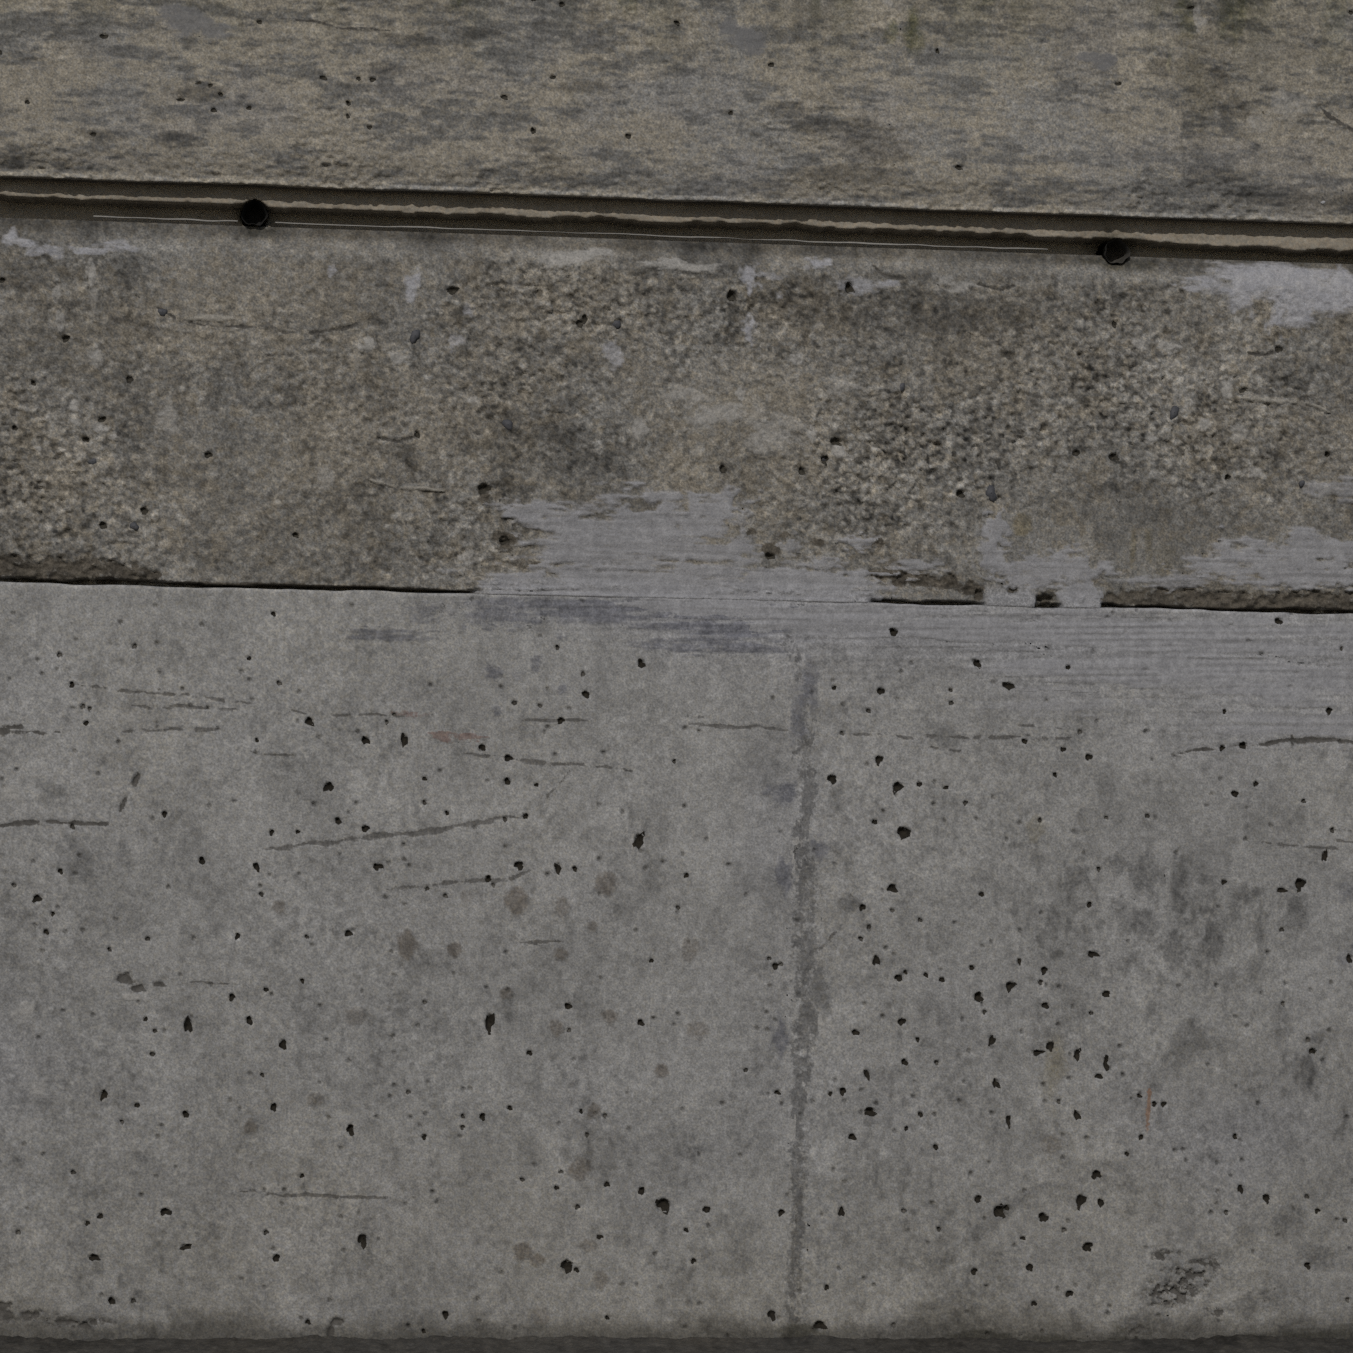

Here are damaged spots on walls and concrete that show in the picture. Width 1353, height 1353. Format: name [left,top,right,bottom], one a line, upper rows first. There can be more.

water stain [359,0,510,80]
water stain [880,1,928,61]
water stain [164,79,230,105]
water stain [527,74,636,96]
water stain [1140,0,1353,214]
water stain [0,151,48,170]
water stain [69,126,209,149]
water stain [753,98,929,190]
spalling [474,485,493,506]
spalling [452,529,542,568]
spalling [745,525,827,561]
spalling [1098,583,1353,614]